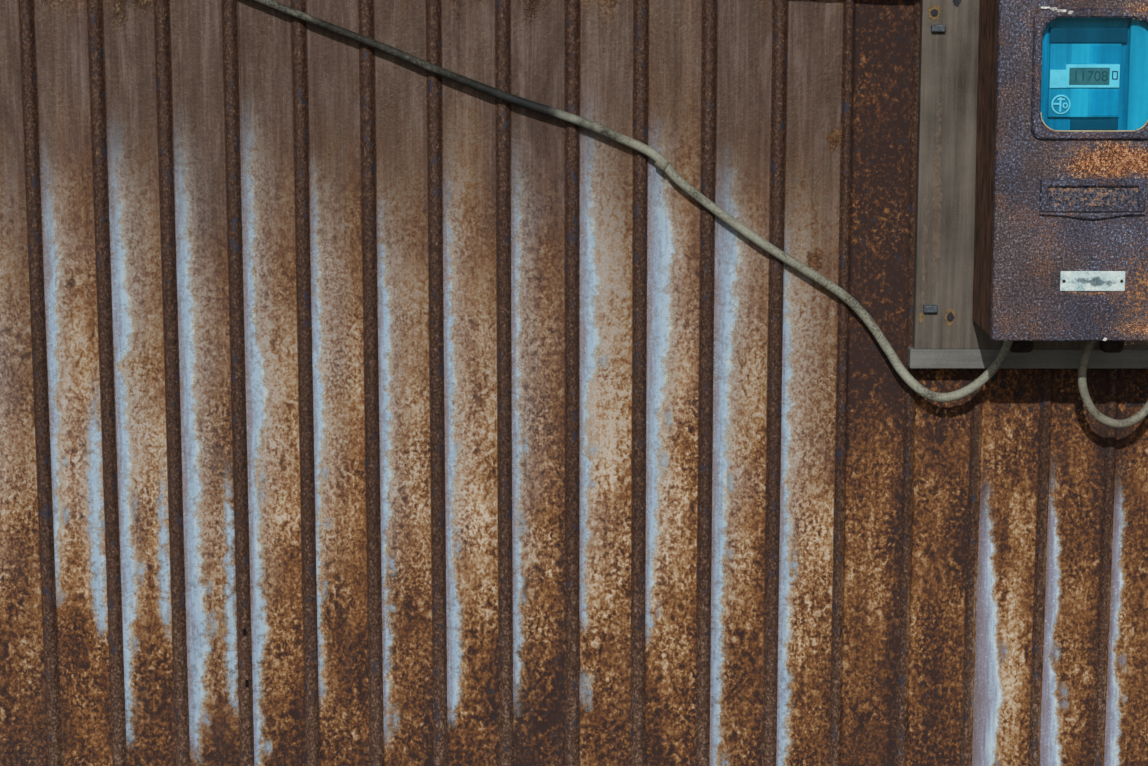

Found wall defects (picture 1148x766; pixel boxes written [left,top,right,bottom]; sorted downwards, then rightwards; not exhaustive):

corrosion [1051,140,1148,179]
corrosion [807,248,823,270]
corrosion [1073,233,1148,345]